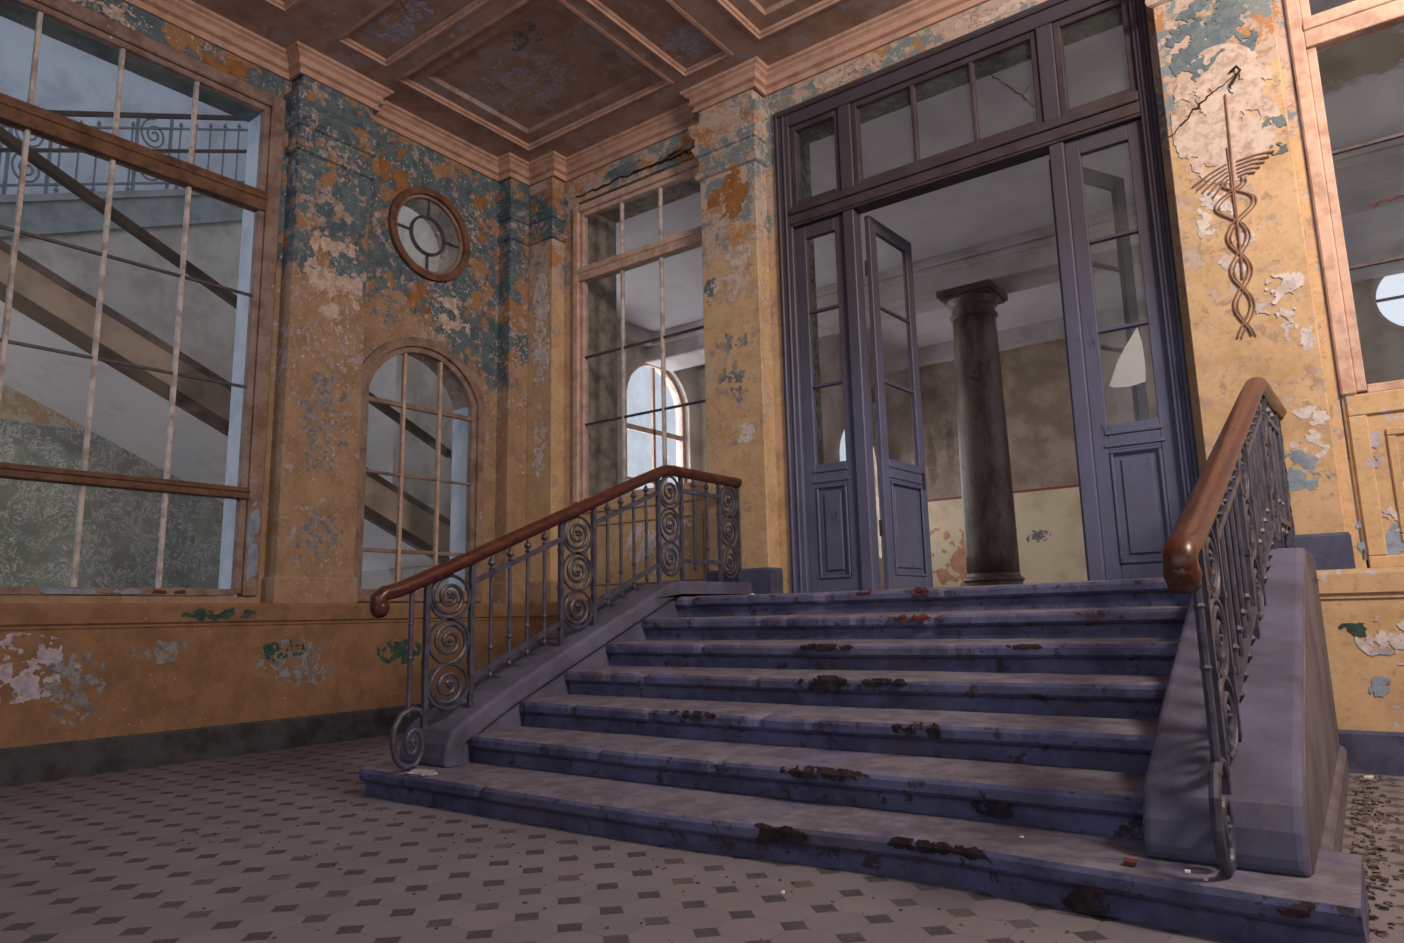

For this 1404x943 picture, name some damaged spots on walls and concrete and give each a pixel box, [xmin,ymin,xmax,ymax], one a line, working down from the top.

crack [575,146,695,198]
crack [1169,73,1240,137]
peeling [1165,0,1288,276]
peeling [304,231,474,342]
peeling [1255,271,1316,351]
peeling [1284,399,1331,491]
peeling [1382,506,1404,555]
peeling [0,632,106,727]
peeling [1338,615,1404,697]
spalling [780,765,870,781]
spalling [754,823,808,845]
spalling [887,836,988,860]